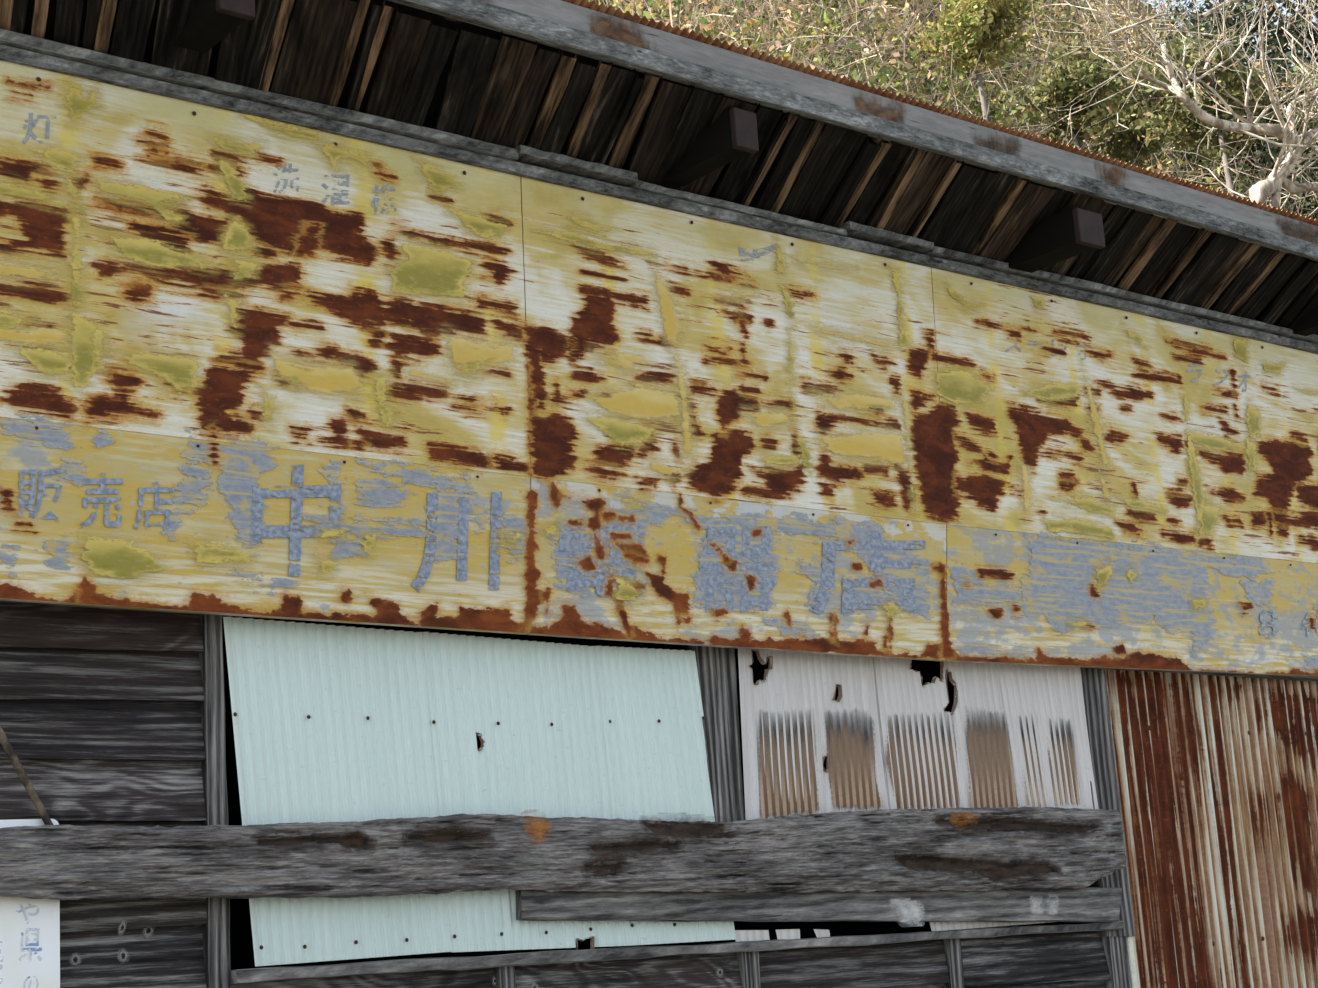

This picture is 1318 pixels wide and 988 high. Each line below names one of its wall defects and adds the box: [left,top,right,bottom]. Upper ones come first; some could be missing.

rust [5,76,51,102]
rust [591,17,650,50]
rust [856,95,903,123]
peeling [0,147,105,388]
peeling [109,233,210,269]
peeling [533,216,693,454]
rust [0,128,1318,551]
peeling [43,533,166,579]
peeling [160,429,300,598]
peeling [303,456,934,639]
peeling [950,375,1276,660]
rust [0,488,1318,988]